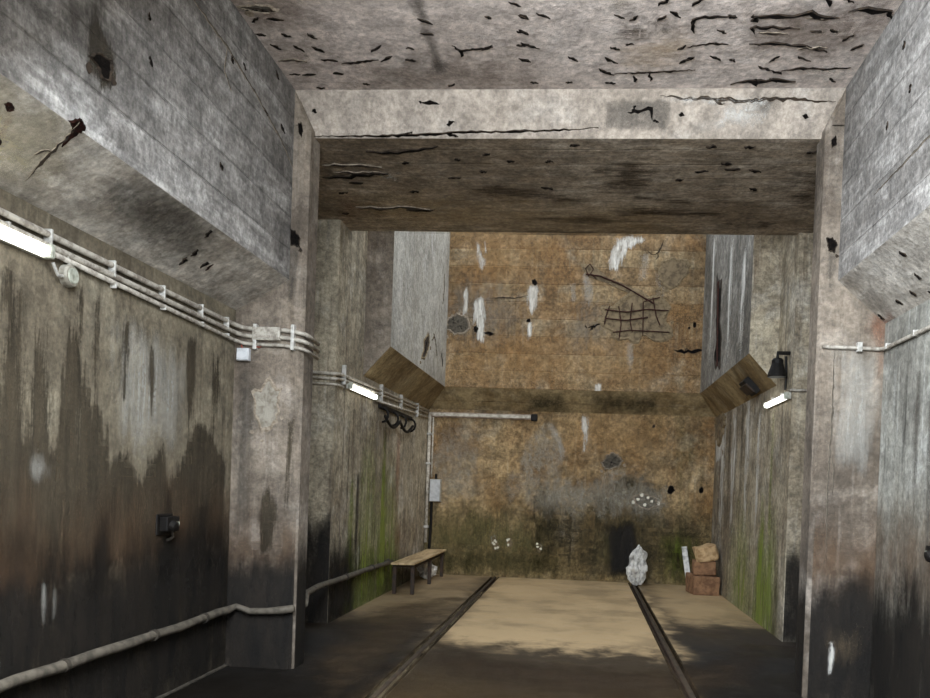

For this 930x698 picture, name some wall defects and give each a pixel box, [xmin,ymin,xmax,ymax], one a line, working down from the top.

crack [25,122,80,181]
damp [0,269,411,698]
damp [744,471,930,698]